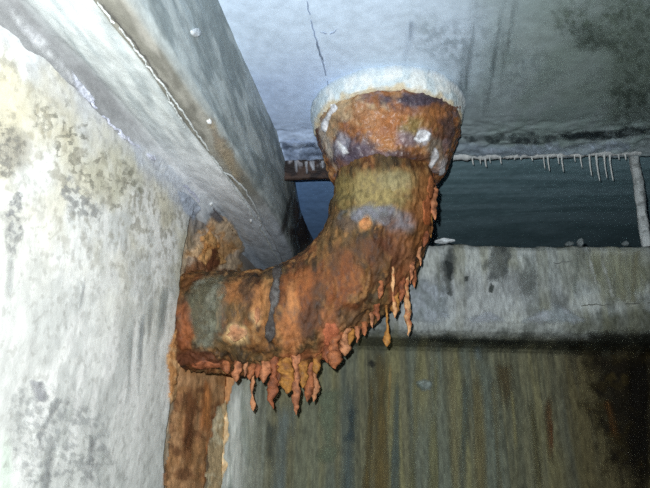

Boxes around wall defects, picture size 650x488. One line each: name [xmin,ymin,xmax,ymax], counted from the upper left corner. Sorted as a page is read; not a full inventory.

crack [307,2,337,85]
mould [0,129,25,177]
mould [61,156,103,217]
corrosion [284,159,330,181]
mould [5,192,22,251]
water stain [139,306,152,363]
corrosion [163,173,439,488]
water stain [32,382,45,400]